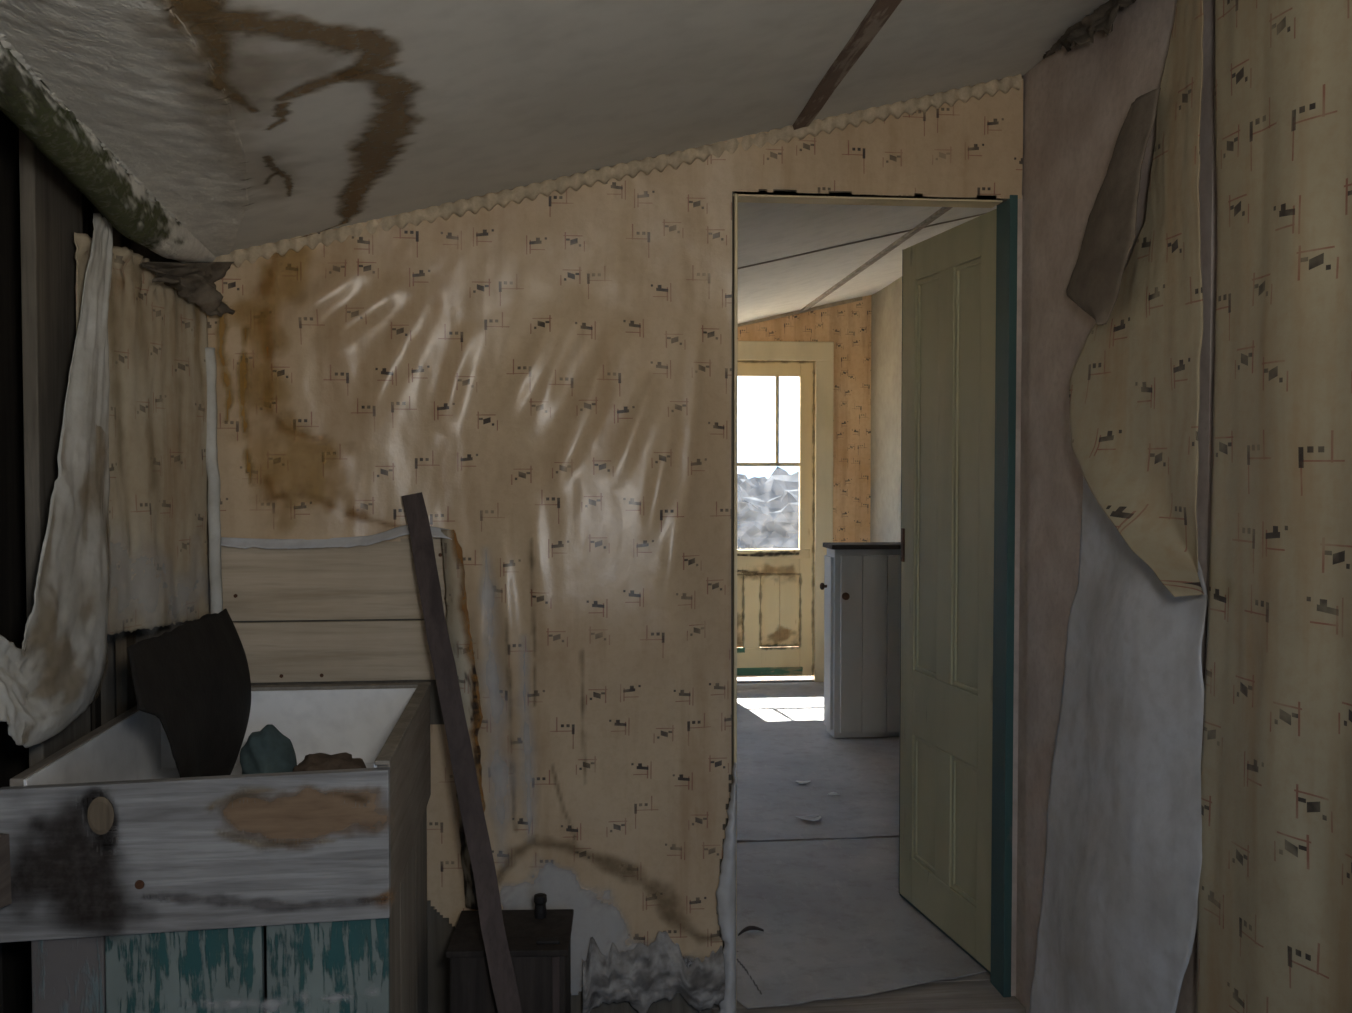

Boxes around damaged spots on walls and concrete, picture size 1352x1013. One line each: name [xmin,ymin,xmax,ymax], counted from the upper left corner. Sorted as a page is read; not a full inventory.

damp [0,42,183,250]
damp [164,0,421,238]